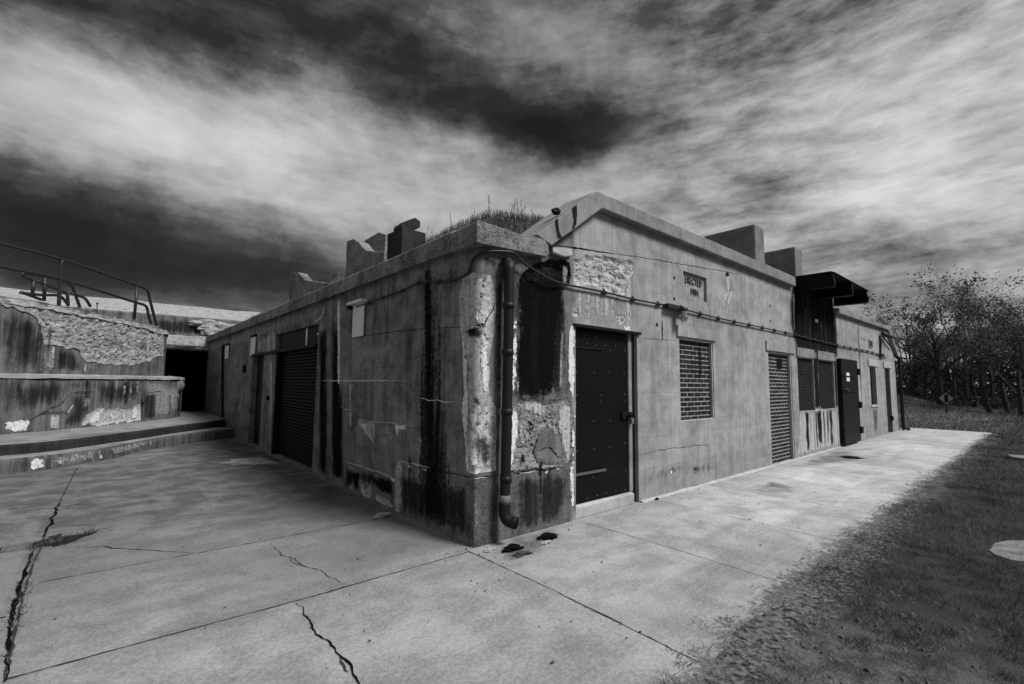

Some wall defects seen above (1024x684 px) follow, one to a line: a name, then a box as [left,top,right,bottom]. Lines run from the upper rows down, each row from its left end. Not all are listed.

spalling [1,299,164,366]
spalling [82,404,142,426]
leakage [319,270,477,533]
spalling [459,272,497,474]
spalling [511,397,573,470]
leakage [497,271,636,527]
spalling [519,254,634,296]
leakage [790,286,865,459]
crack [4,500,190,681]
crack [270,543,360,684]